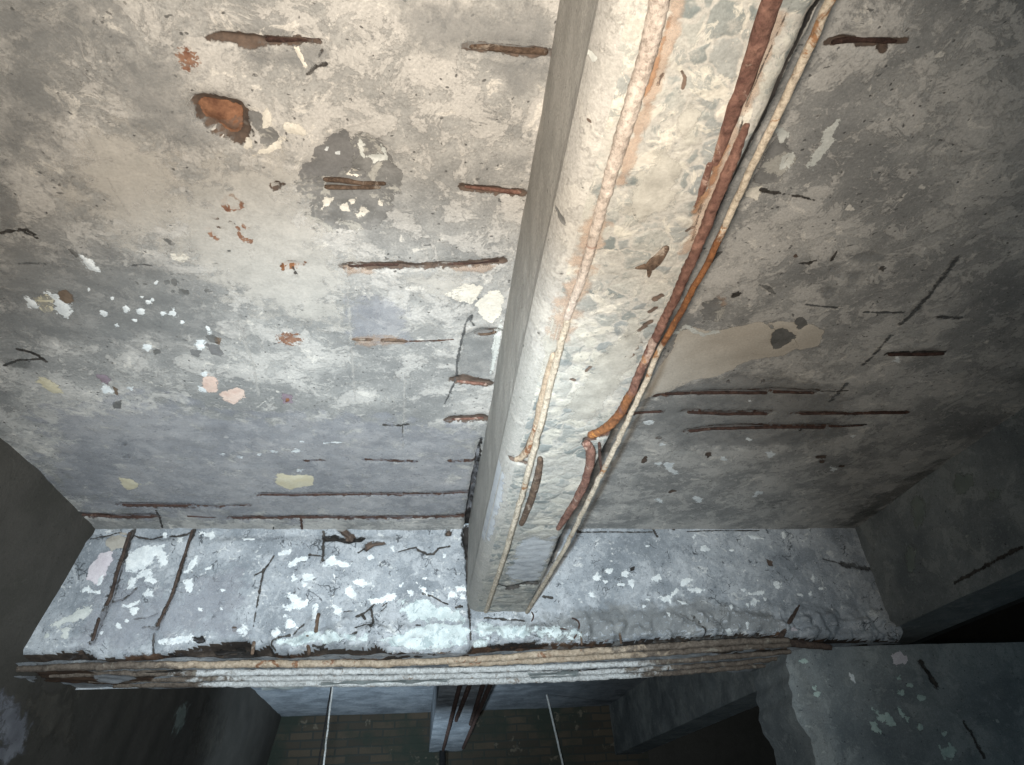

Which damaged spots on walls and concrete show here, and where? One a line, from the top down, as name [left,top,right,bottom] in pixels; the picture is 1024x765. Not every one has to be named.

corrosion [644,17,670,96]
crack [691,0,819,241]
flaking render [482,0,909,617]
crack [595,256,963,465]
spalling [14,438,832,751]